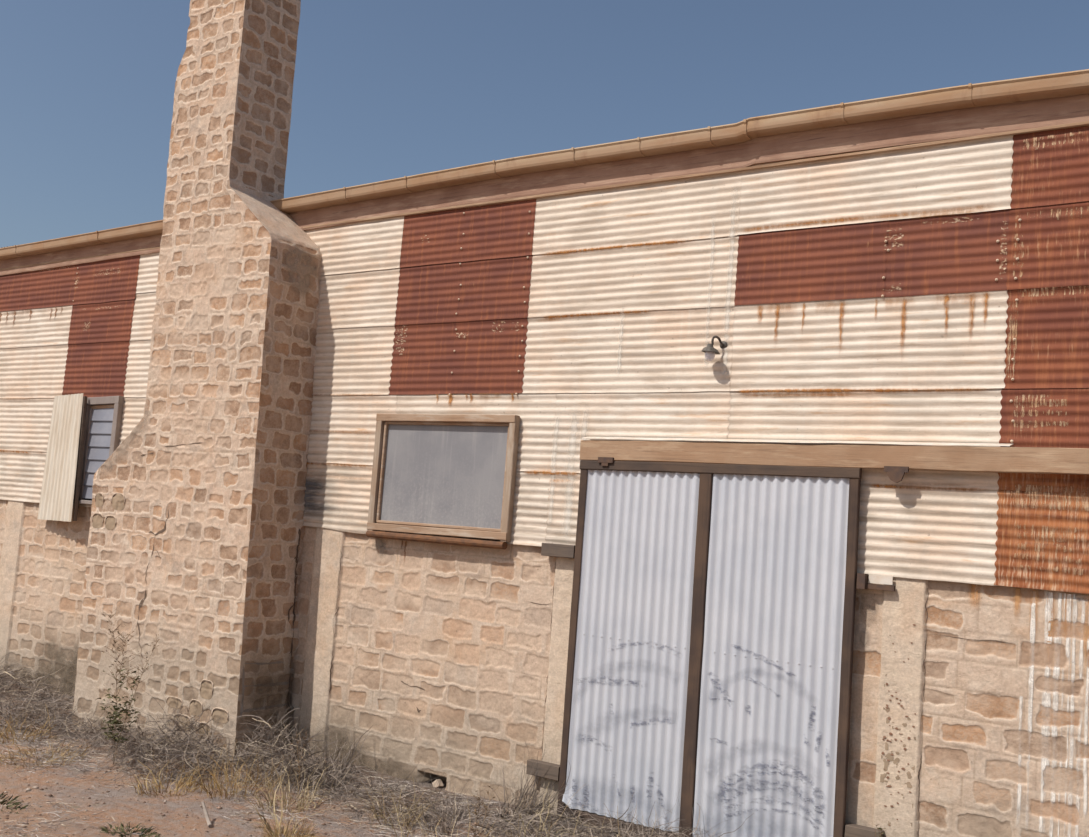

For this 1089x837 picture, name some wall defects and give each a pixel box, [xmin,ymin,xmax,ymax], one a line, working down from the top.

rust [747,218,857,231]
damp [304,479,326,510]
crack [137,511,169,656]
damp [1018,592,1089,813]
damp [1039,816,1078,837]